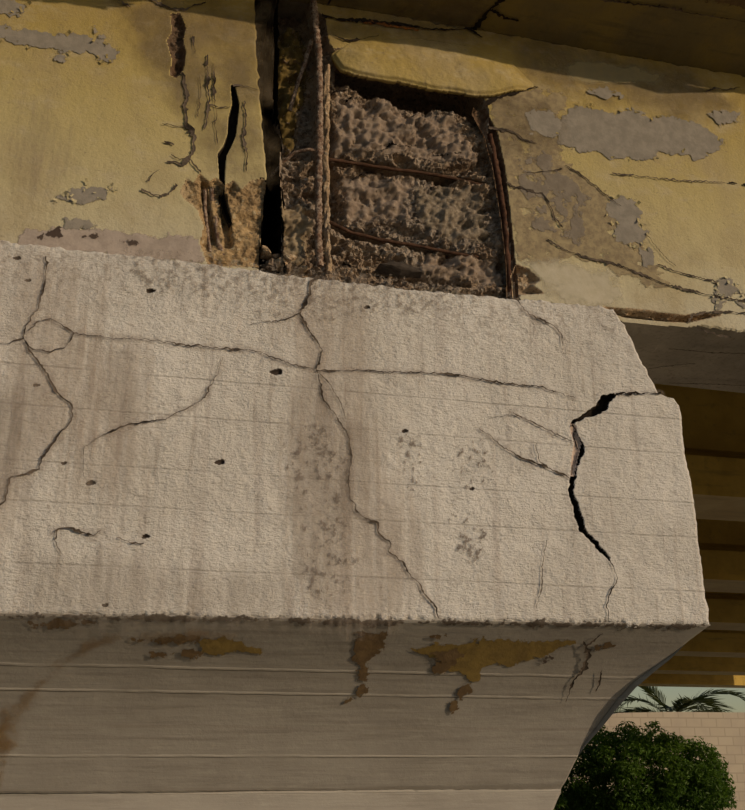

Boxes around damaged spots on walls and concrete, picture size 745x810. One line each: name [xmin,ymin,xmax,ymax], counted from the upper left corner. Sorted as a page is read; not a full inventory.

crack [152,0,206,11]
crack [321,0,519,42]
crack [602,0,745,22]
crack [141,36,258,228]
spalling [0,0,745,300]
crack [0,165,745,701]
peeling [131,634,262,659]
peeling [343,631,388,704]
peeling [410,634,576,714]